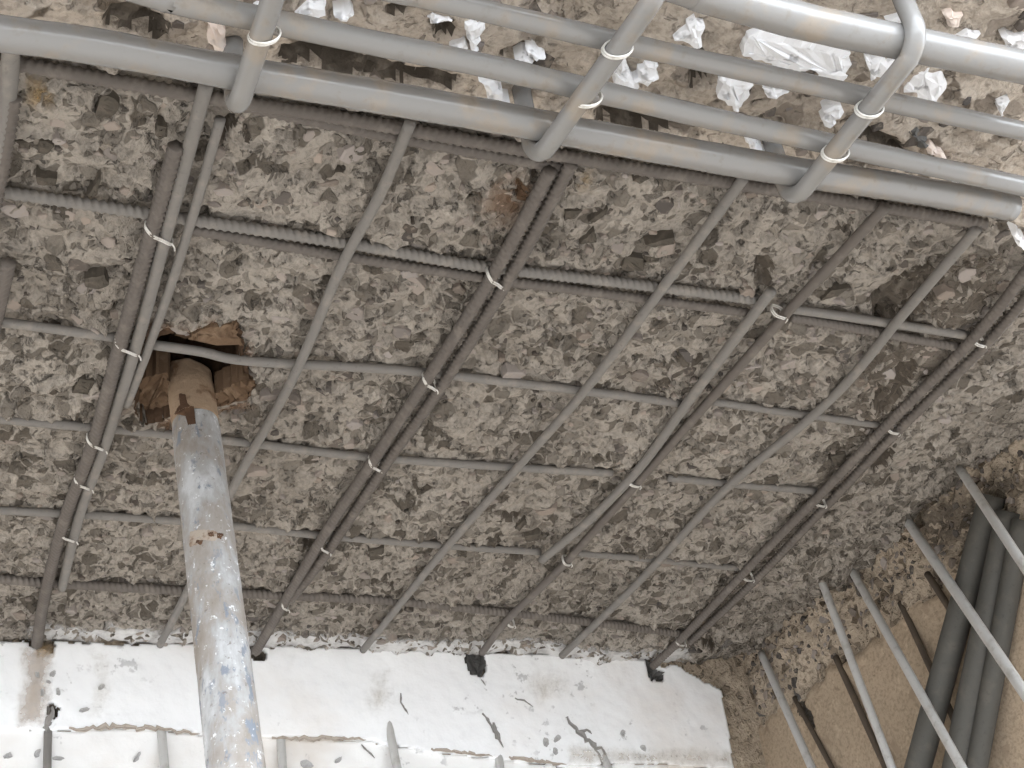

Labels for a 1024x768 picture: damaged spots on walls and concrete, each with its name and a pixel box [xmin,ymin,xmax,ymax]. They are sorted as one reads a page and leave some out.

spalling [0,0,214,50]
spalling [265,35,487,98]
spalling [320,0,601,76]
spalling [639,63,855,134]
spalling [895,64,1024,121]
spalling [916,0,1024,45]
spalling [7,72,194,208]
spalling [180,105,395,239]
spalling [355,146,541,274]
spalling [0,190,1024,768]
crack [431,713,566,766]
crack [566,716,607,764]